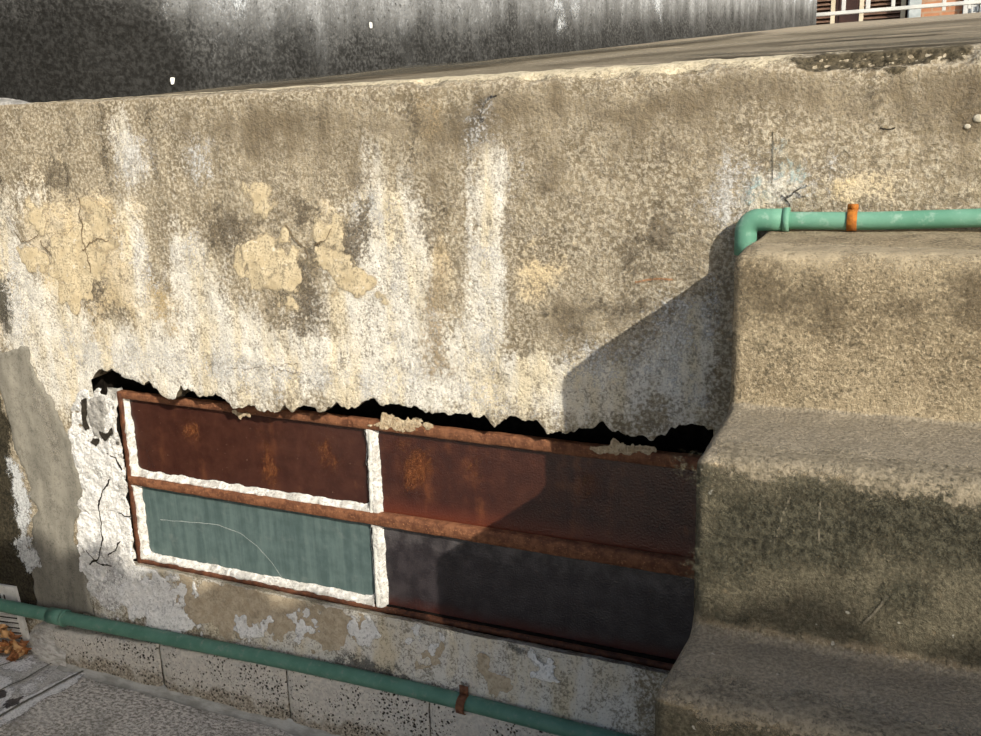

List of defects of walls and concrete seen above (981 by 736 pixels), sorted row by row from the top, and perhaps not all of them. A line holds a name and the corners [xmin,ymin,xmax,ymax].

spalling [791,44,973,75]
leakage [0,250,33,344]
peeling [16,196,119,315]
crack [78,197,109,273]
leakage [178,198,264,266]
leakage [266,242,334,342]
peeling [233,213,388,312]
leakage [332,195,382,270]
spalling [283,398,713,456]
leakage [0,401,42,605]
crack [86,453,133,567]
spalling [68,387,381,654]